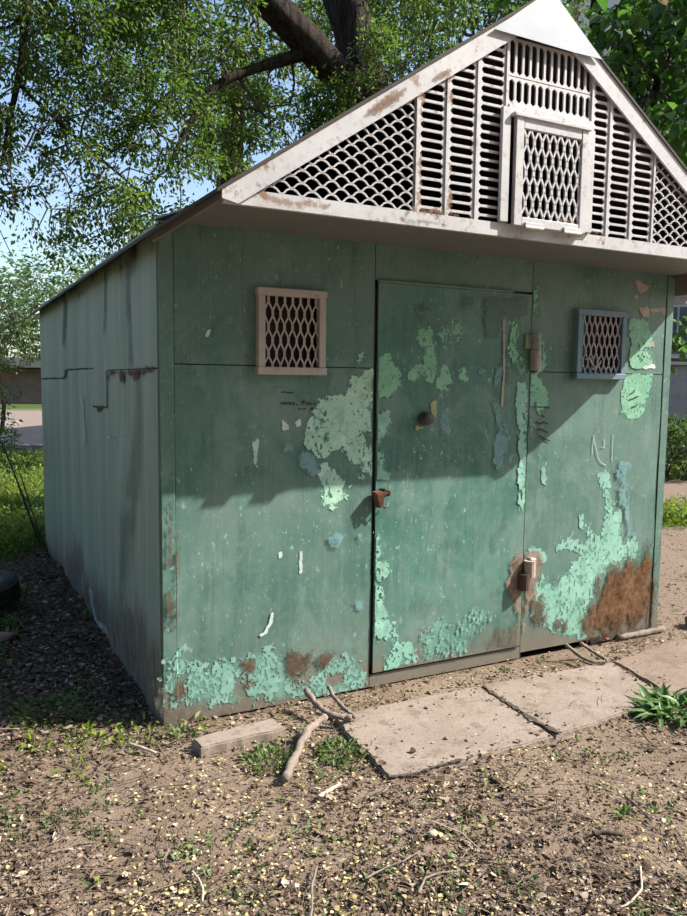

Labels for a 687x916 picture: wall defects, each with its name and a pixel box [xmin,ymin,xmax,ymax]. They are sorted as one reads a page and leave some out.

corrosion [369,88,406,113]
corrosion [412,153,458,217]
corrosion [93,366,153,412]
peeling [282,318,468,511]
peeling [507,319,549,512]
peeling [620,280,666,420]
peeling [374,534,496,670]
corrosion [506,551,568,632]
peeling [528,469,640,640]
corrosion [581,544,658,642]
peeling [157,642,368,709]
corrosion [285,649,336,680]